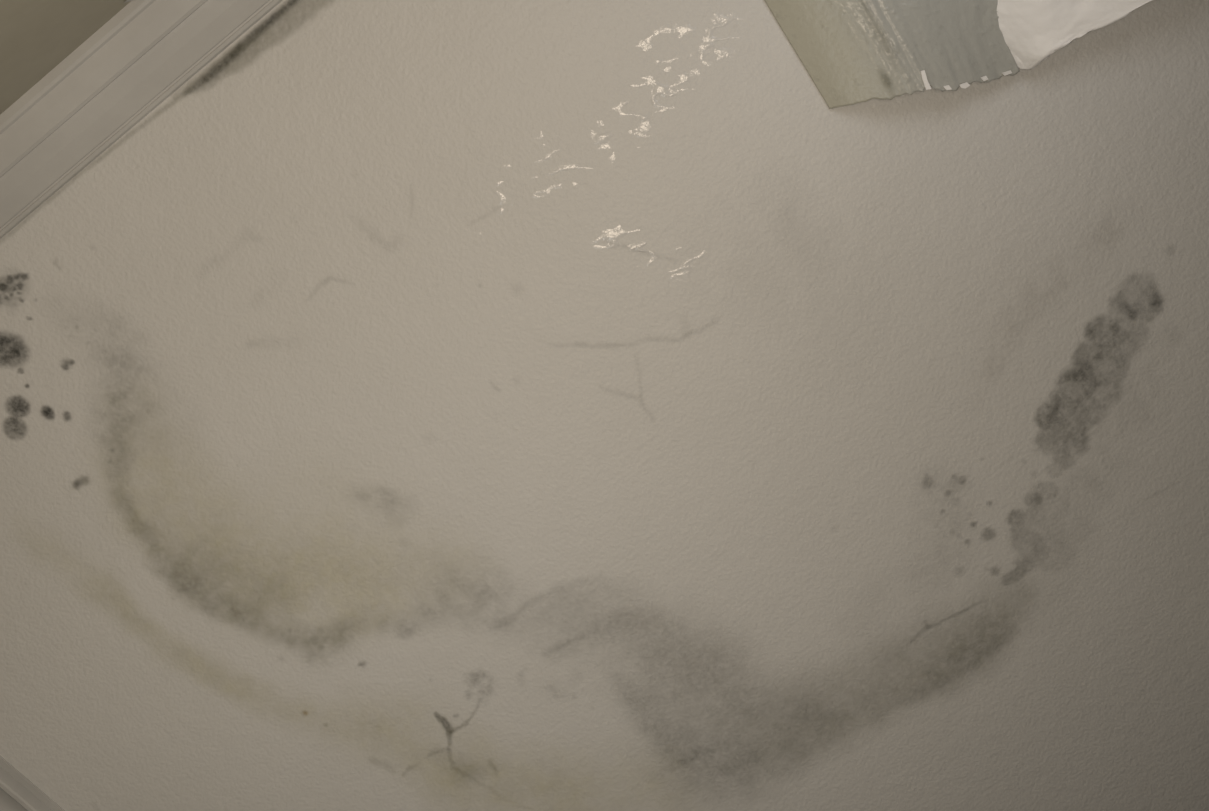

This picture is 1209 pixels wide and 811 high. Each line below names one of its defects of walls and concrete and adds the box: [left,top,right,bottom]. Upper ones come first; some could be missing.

peeling [764,0,1152,109]
damp [0,337,21,361]